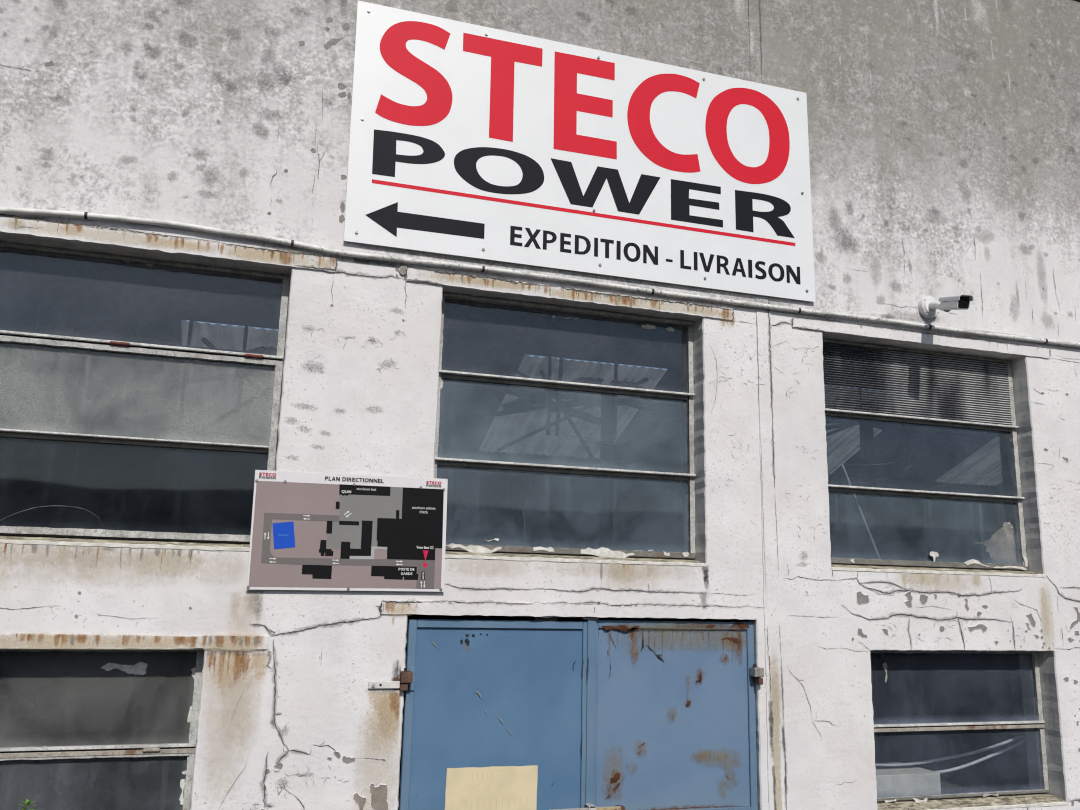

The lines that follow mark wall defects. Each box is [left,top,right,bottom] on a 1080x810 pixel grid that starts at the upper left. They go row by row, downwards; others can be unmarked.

crack [1,214,1080,810]
peeling [856,591,870,605]
peeling [904,591,937,608]
corrosion [176,636,250,675]
corrosion [602,625,664,677]
corrosion [697,622,749,651]
peeling [957,595,1023,649]
peeling [1025,612,1054,650]
peeling [1067,606,1080,643]
peeling [326,751,356,764]
peeling [353,782,389,810]